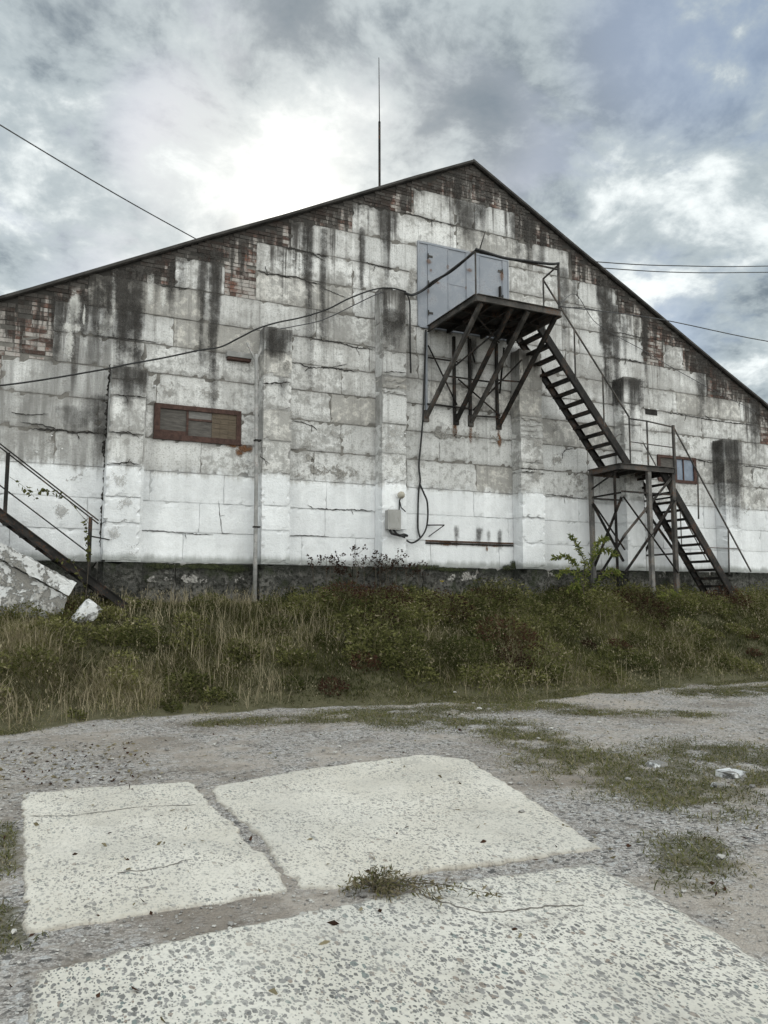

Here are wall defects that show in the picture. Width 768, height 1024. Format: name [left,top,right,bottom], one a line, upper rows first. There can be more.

damp [377,208,391,240]
damp [167,260,176,299]
damp [304,224,327,310]
damp [79,267,148,403]
damp [198,249,222,372]
damp [266,327,291,355]
damp [383,291,406,346]
damp [597,278,649,414]
corrosion [228,445,252,455]
damp [712,439,743,515]
peeling [29,577,54,614]
crack [418,893,580,913]